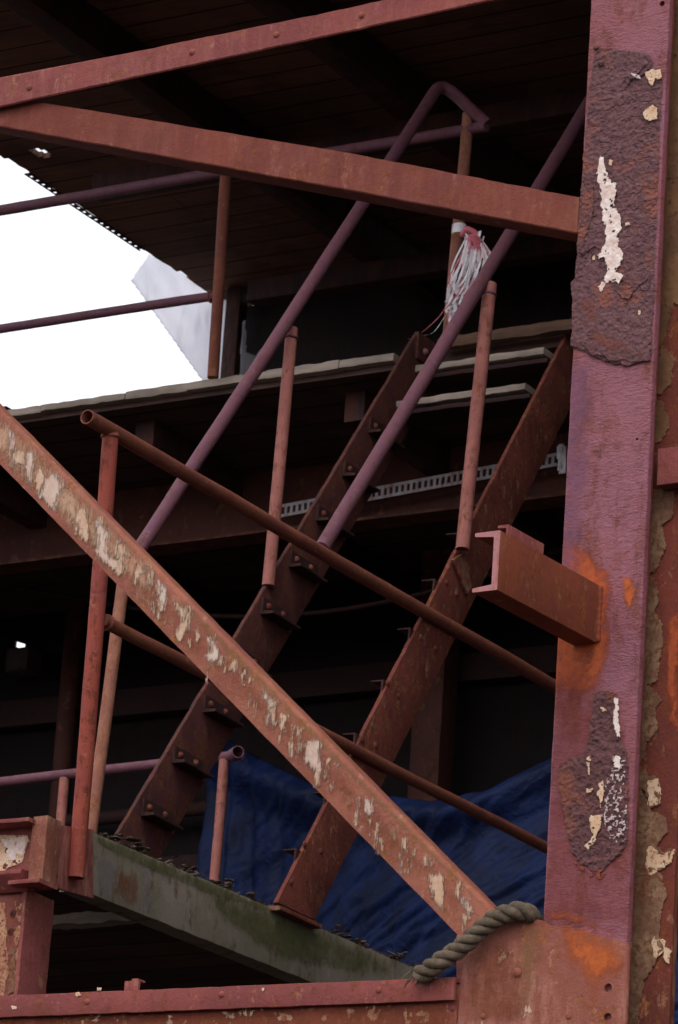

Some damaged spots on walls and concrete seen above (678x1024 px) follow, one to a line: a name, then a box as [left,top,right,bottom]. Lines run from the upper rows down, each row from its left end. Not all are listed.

peeling [570,0,678,443]
peeling [0,416,339,791]
rust [556,543,609,693]
rust [623,578,635,608]
peeling [584,489,675,1024]
peeling [0,835,30,871]
peeling [353,796,473,931]
rust [551,913,622,980]